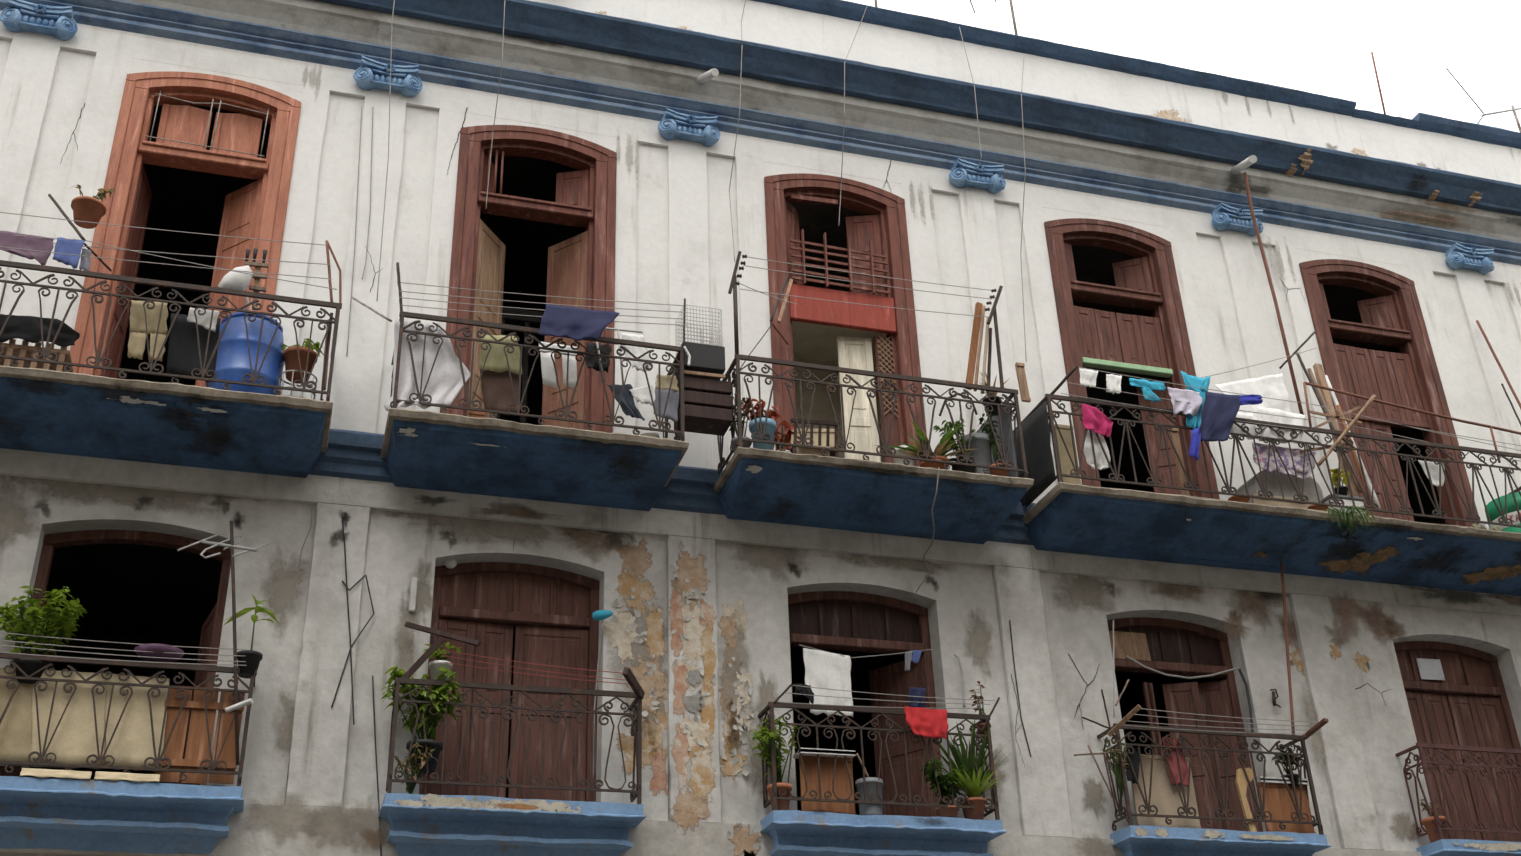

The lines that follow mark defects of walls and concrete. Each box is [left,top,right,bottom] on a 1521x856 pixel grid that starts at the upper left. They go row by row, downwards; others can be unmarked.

peeling [1318,537,1422,575]
peeling [1463,564,1521,584]
peeling [602,539,755,834]